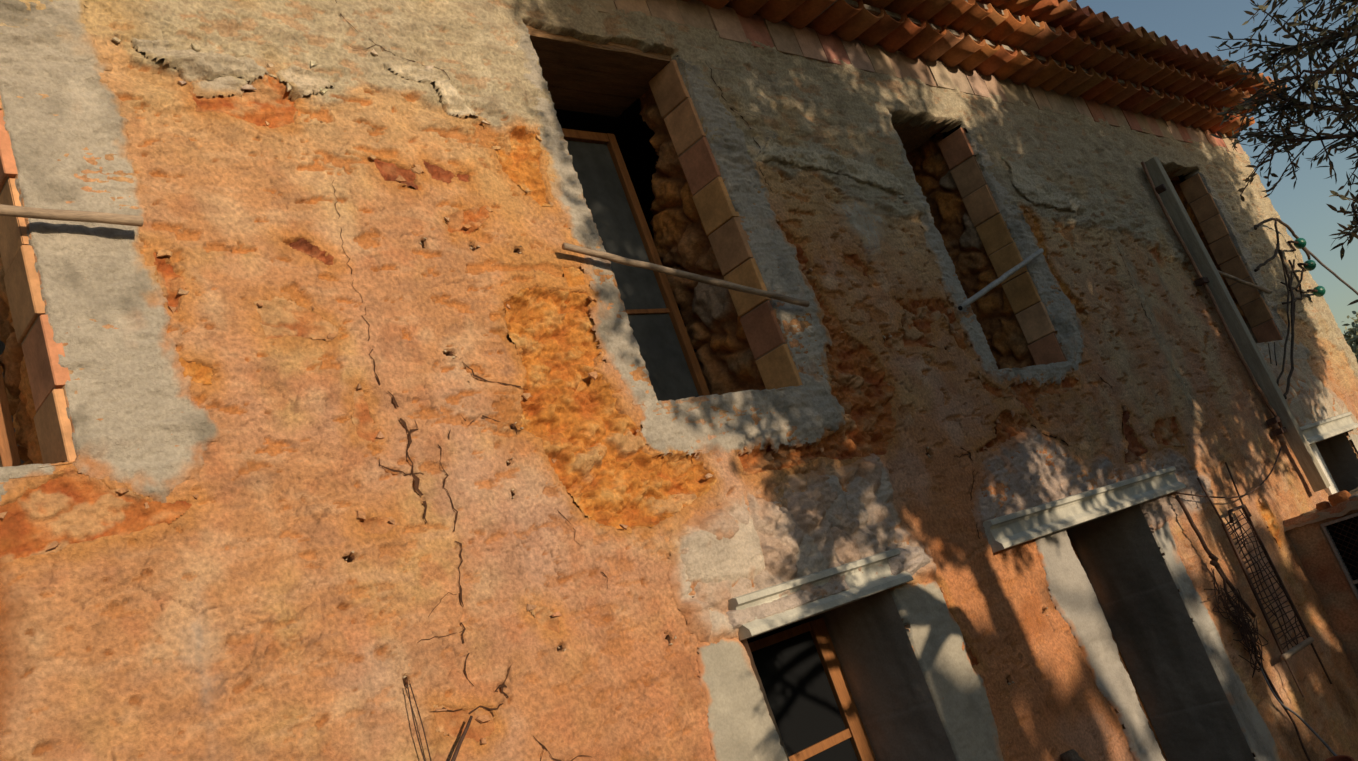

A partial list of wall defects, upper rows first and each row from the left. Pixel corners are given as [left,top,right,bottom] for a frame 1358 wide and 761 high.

crack [332,180,511,717]
crack [450,353,527,390]
spalling [503,267,717,534]
spalling [738,218,967,475]